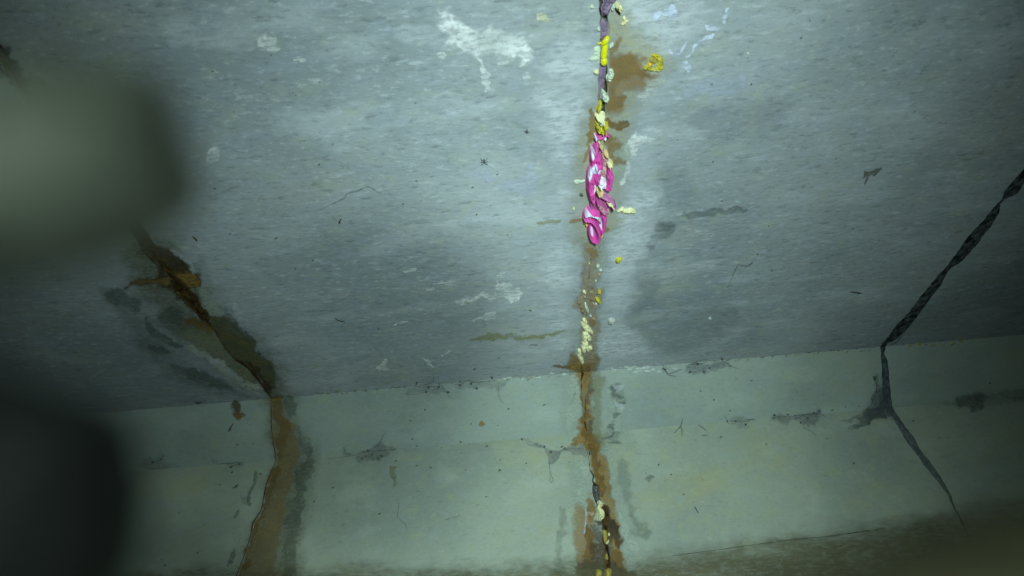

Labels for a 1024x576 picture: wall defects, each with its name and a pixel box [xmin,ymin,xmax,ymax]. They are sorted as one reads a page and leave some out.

damp [438,10,533,92]
crack [598,0,608,112]
corrosion [579,15,664,176]
corrosion [125,247,280,387]
crack [144,245,277,574]
corrosion [553,354,626,575]
crack [581,368,611,573]
crack [880,169,1024,522]